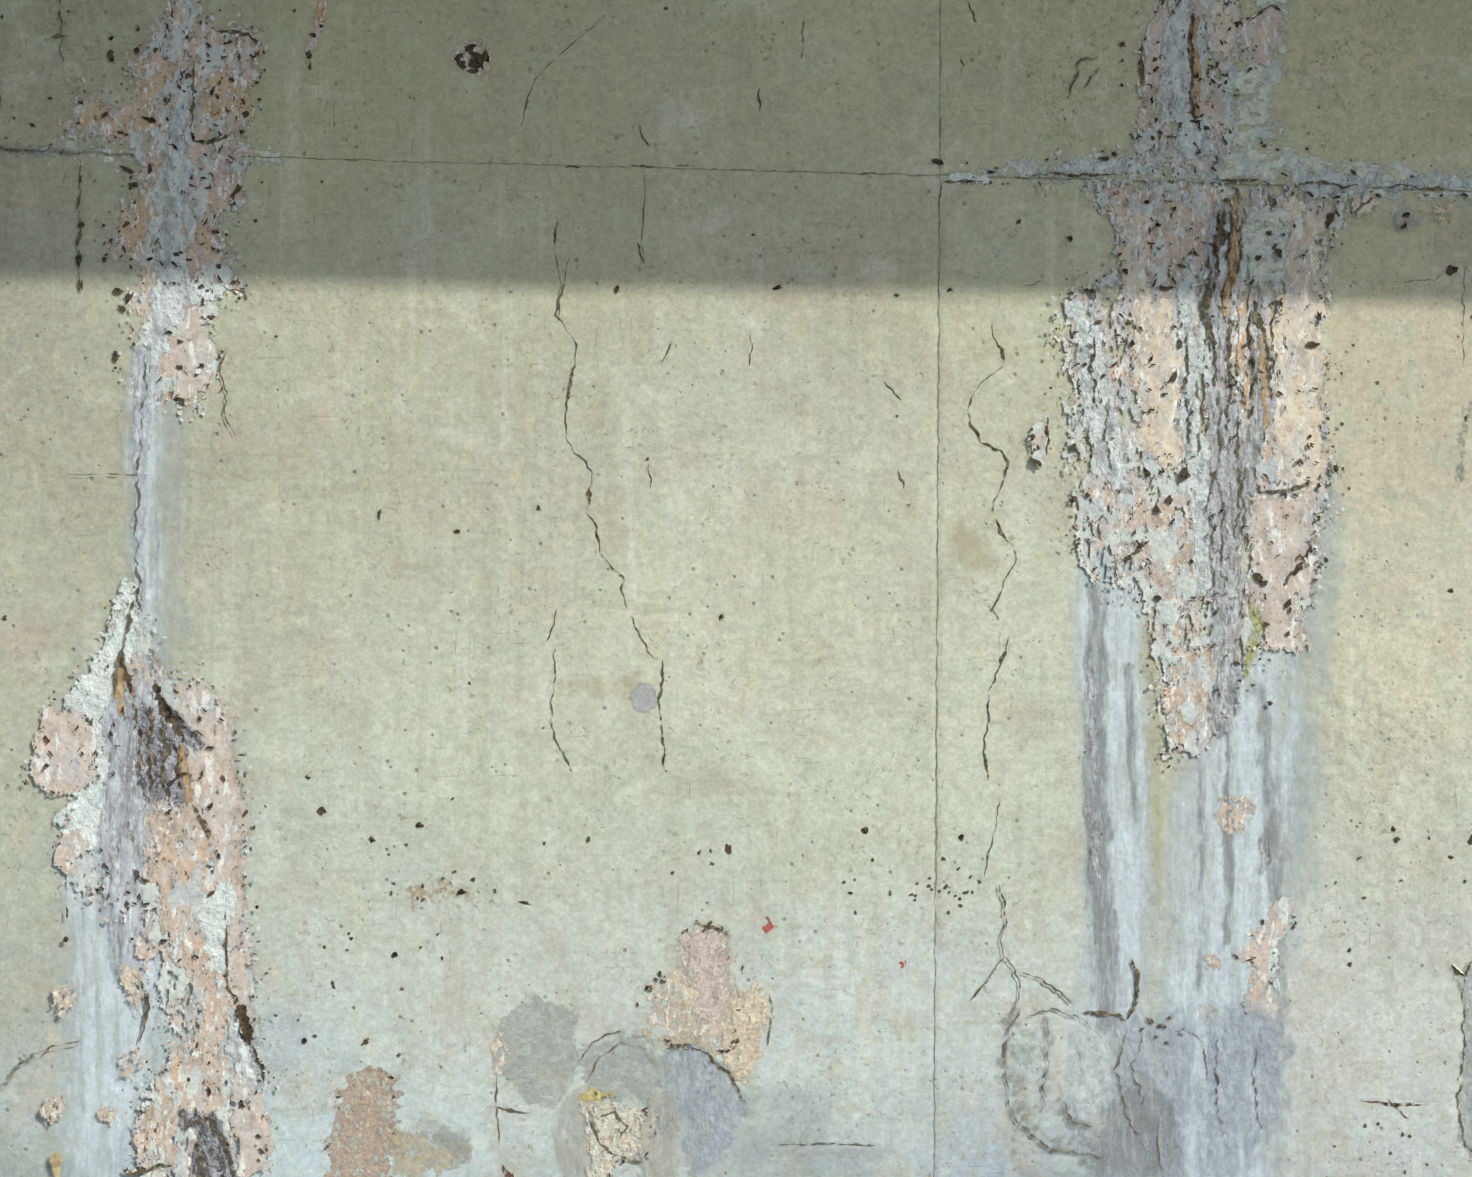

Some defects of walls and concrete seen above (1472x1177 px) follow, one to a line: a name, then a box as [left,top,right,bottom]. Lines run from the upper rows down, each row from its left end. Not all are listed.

damp [63,854,166,1177]
damp [106,345,163,677]
spalling [22,586,287,1177]
spalling [48,0,268,427]
spalling [324,1065,472,1177]
crack [546,609,570,767]
crack [553,222,666,766]
spalling [578,920,775,1177]
crack [968,324,1071,1013]
damp [1074,543,1151,1028]
spalling [1028,0,1380,769]
damp [1166,644,1302,1177]